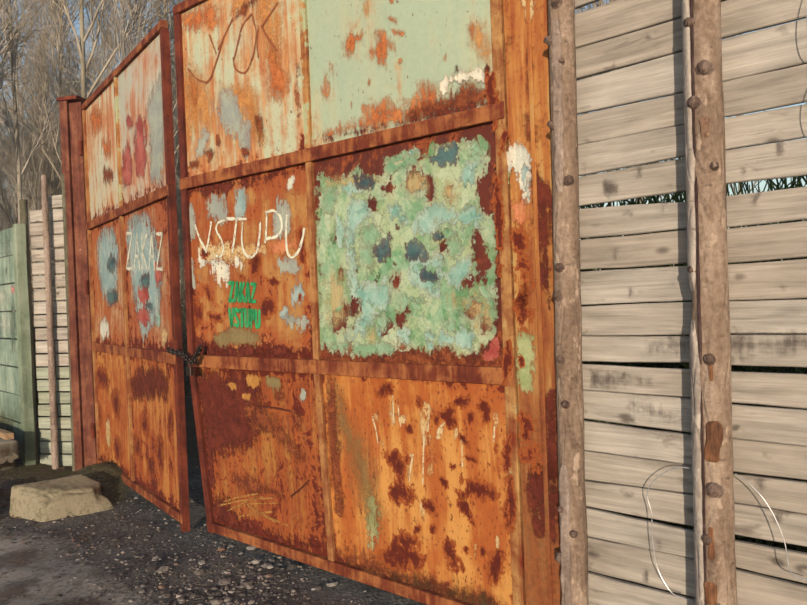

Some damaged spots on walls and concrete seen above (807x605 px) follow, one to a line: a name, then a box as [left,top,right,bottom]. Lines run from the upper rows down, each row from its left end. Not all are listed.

rust [91,105,113,184]
rust [184,65,221,168]
rust [370,17,405,65]
rust [323,83,488,142]
peeling [439,64,500,105]
peeling [97,211,168,346]
peeling [189,118,537,394]
rust [531,169,553,310]
rust [131,364,174,481]
rust [197,369,318,549]
rust [326,376,344,516]
rust [526,389,560,543]